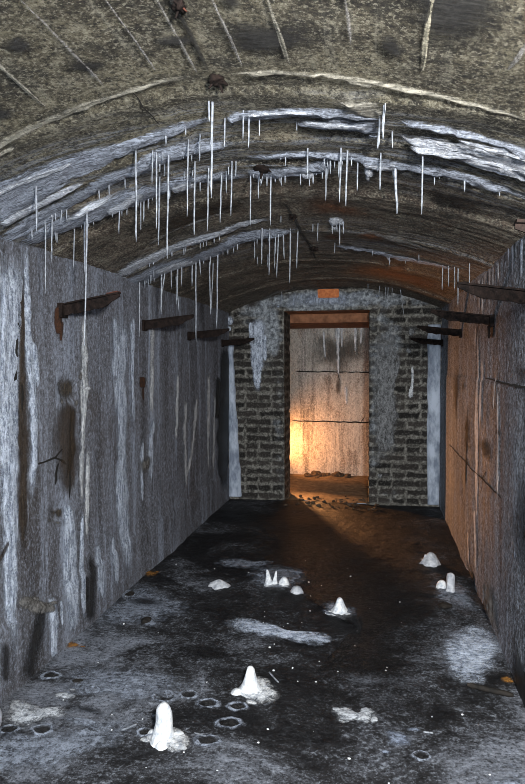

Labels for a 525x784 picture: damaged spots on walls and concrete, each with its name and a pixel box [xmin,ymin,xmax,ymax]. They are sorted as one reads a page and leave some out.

damp [247,112,366,131]
damp [411,141,525,173]
damp [0,163,72,195]
damp [2,184,82,226]
damp [66,194,143,222]
damp [157,201,233,234]
damp [182,231,229,247]
damp [155,260,196,275]
damp [508,239,523,278]
damp [249,321,267,388]
crack [486,378,525,390]
crack [450,426,501,498]